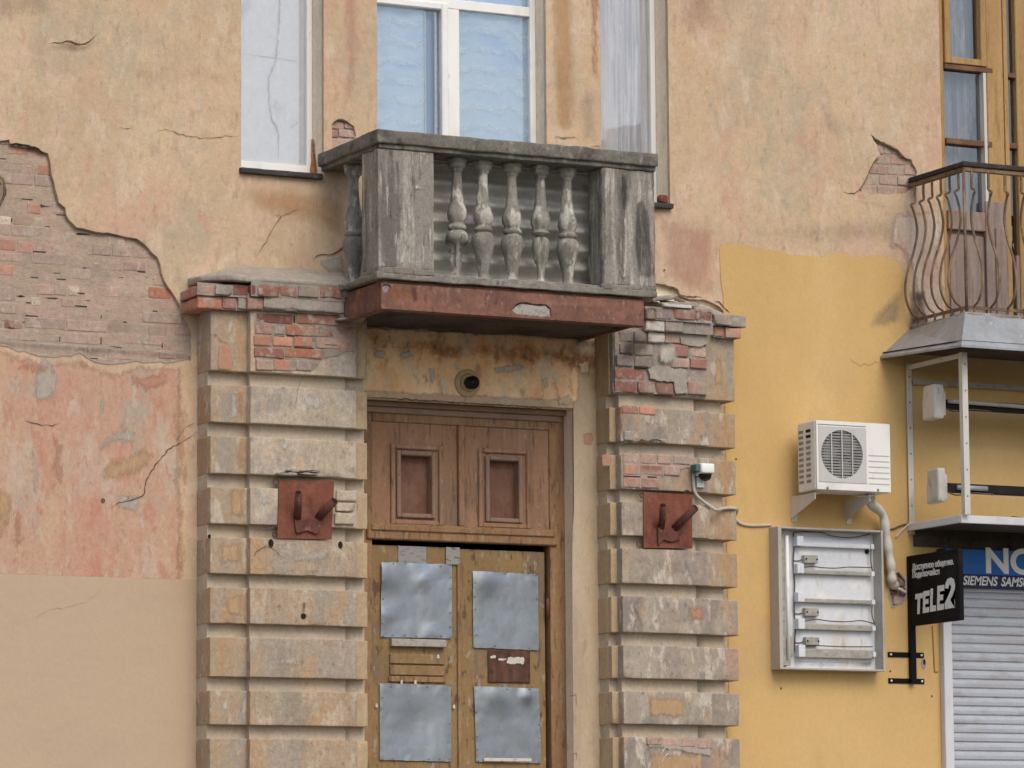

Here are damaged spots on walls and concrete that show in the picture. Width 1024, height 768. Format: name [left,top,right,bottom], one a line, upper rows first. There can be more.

flaking render [332,119,355,148]
flaking render [848,135,916,195]
peeling [0,140,191,579]
flaking render [254,313,356,371]
flaking render [609,328,722,415]
crack [109,424,198,509]